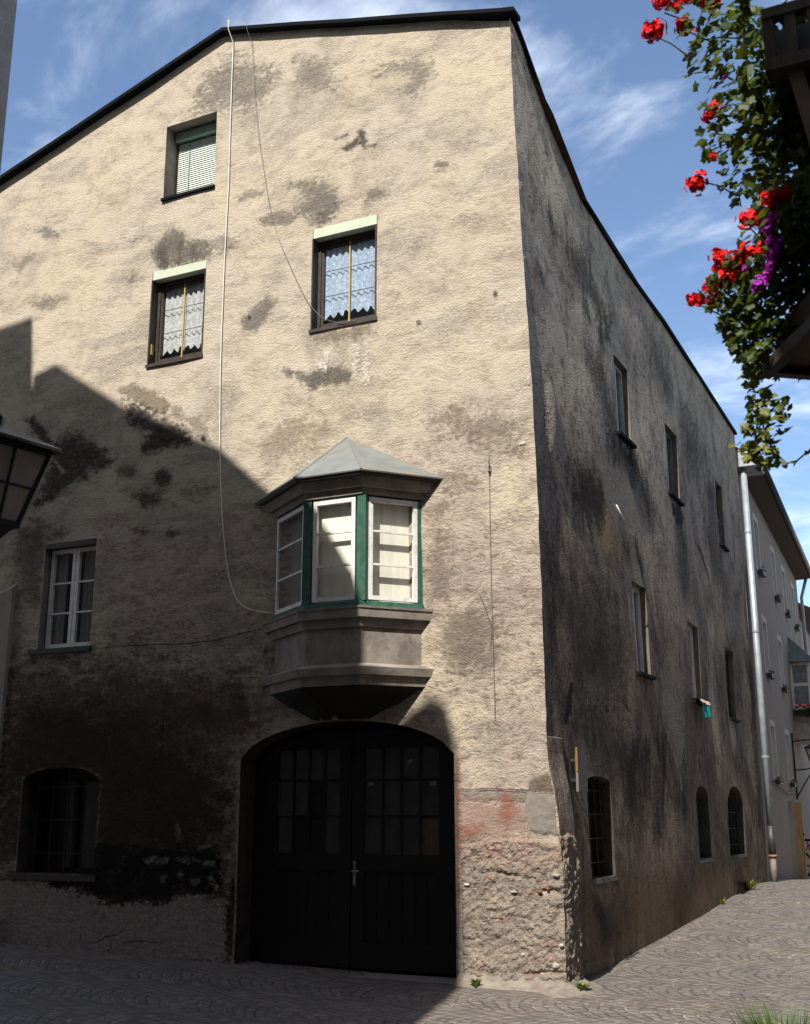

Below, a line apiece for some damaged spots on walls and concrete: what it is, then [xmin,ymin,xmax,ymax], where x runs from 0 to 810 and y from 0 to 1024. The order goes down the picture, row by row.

water stain [260,180,337,224]
water stain [153,229,207,268]
water stain [284,339,370,390]
water stain [25,415,52,444]
water stain [705,617,737,788]
spalling [456,773,583,983]